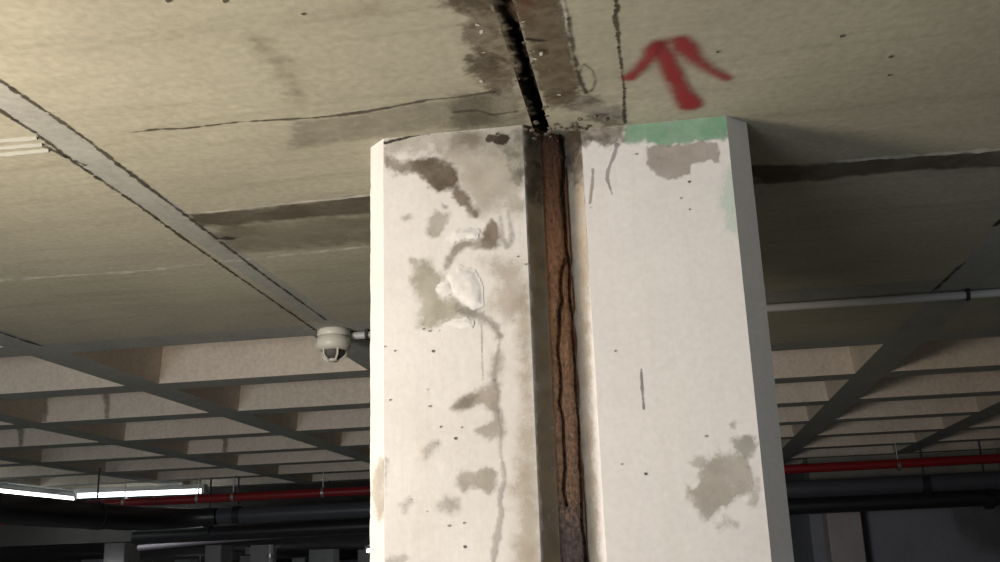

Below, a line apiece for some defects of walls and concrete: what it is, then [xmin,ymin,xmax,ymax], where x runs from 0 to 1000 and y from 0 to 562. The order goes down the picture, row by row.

crack [139,91,518,132]
water stain [447,0,518,93]
water stain [566,17,596,94]
crack [589,0,626,204]
water stain [385,125,561,562]
crack [556,134,586,562]
water stain [565,147,598,562]
water stain [689,436,758,517]